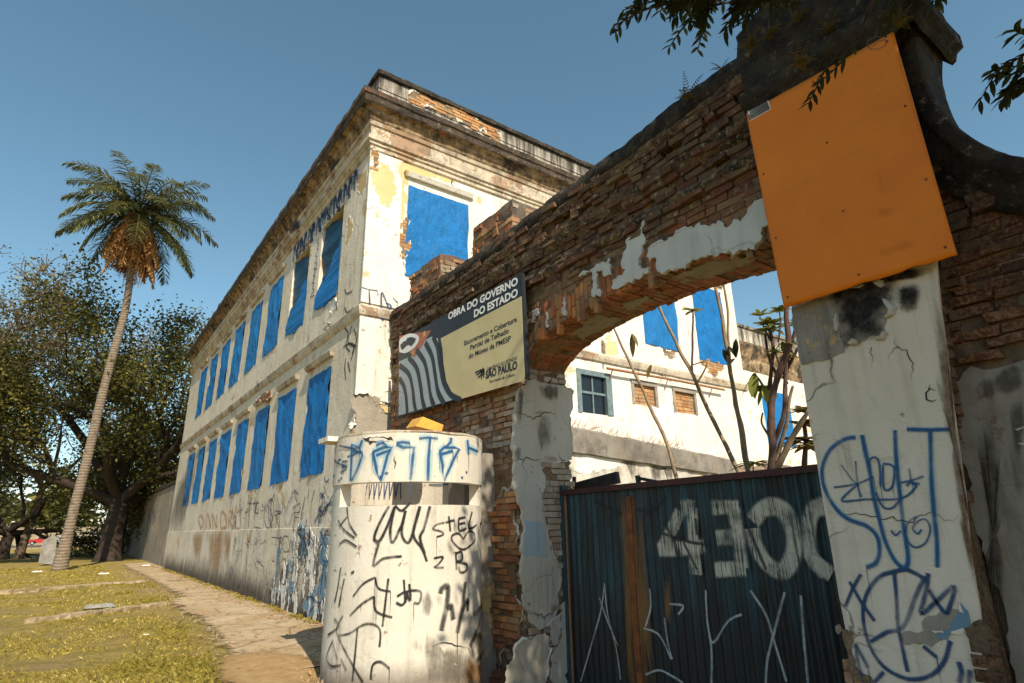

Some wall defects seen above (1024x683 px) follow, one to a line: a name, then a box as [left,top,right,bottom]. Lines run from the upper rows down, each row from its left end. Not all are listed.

flaking render [408,89,502,143]
flaking render [357,149,455,273]
flaking render [578,198,768,297]
crack [870,337,937,402]
flaking render [348,391,393,445]
damp [165,562,324,623]
flaking render [487,465,526,683]
damp [980,443,1002,634]
flaking render [897,601,1007,683]